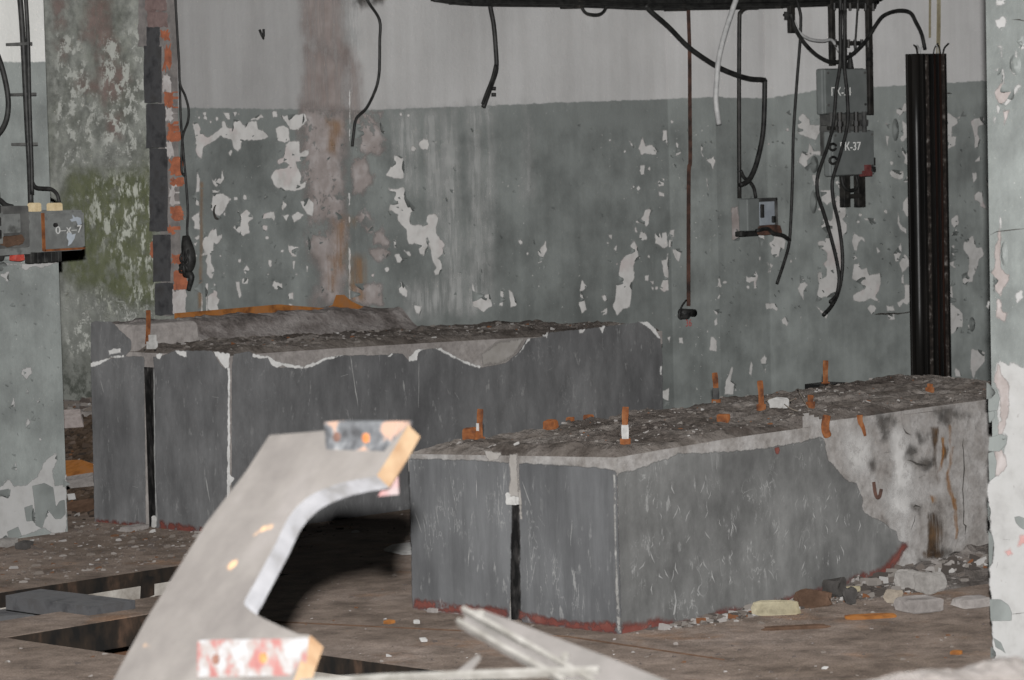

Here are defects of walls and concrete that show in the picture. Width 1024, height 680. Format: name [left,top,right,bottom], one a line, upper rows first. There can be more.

peeling [995,0,1006,31]
leakage [55,3,155,355]
peeling [187,90,450,316]
peeling [600,207,692,333]
peeling [950,215,1009,334]
spalling [253,354,338,369]
spalling [436,338,530,368]
corrosion [821,415,831,438]
peeling [0,453,70,538]
spalling [803,349,1024,659]